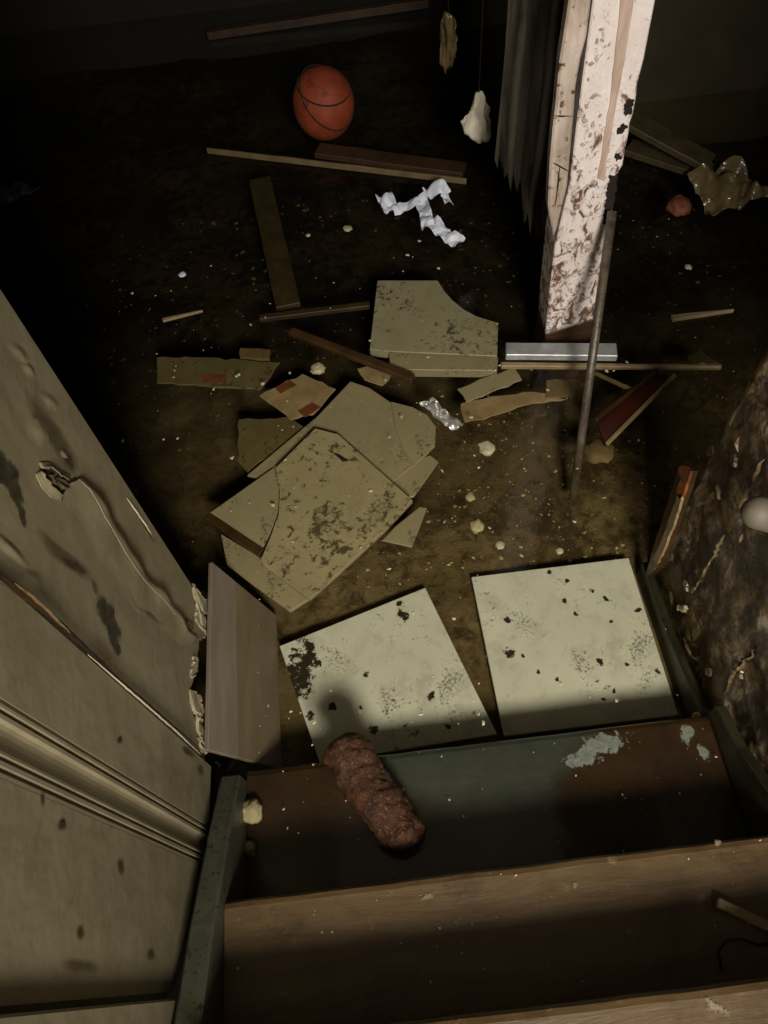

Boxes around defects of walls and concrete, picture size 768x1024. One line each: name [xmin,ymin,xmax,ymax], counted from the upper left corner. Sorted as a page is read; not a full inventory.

damp [0,451,26,527]
crack [127,498,154,542]
damp [93,583,121,656]
peeling [566,731,629,768]
peeling [680,712,709,760]